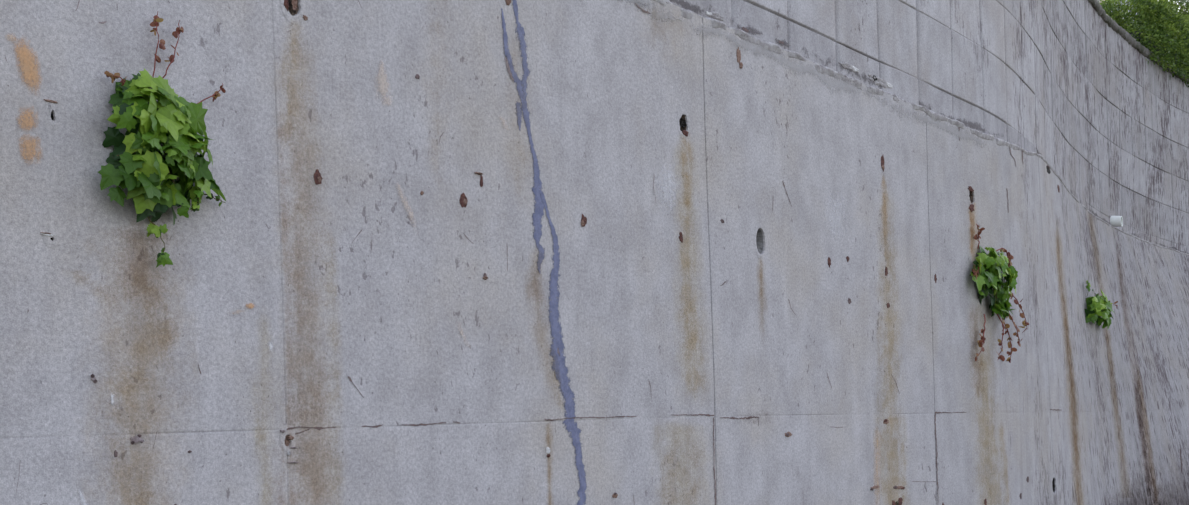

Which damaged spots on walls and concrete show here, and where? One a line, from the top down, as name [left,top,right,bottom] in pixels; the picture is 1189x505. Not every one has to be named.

corrosion [15,42,39,87]
crack [501,0,587,505]